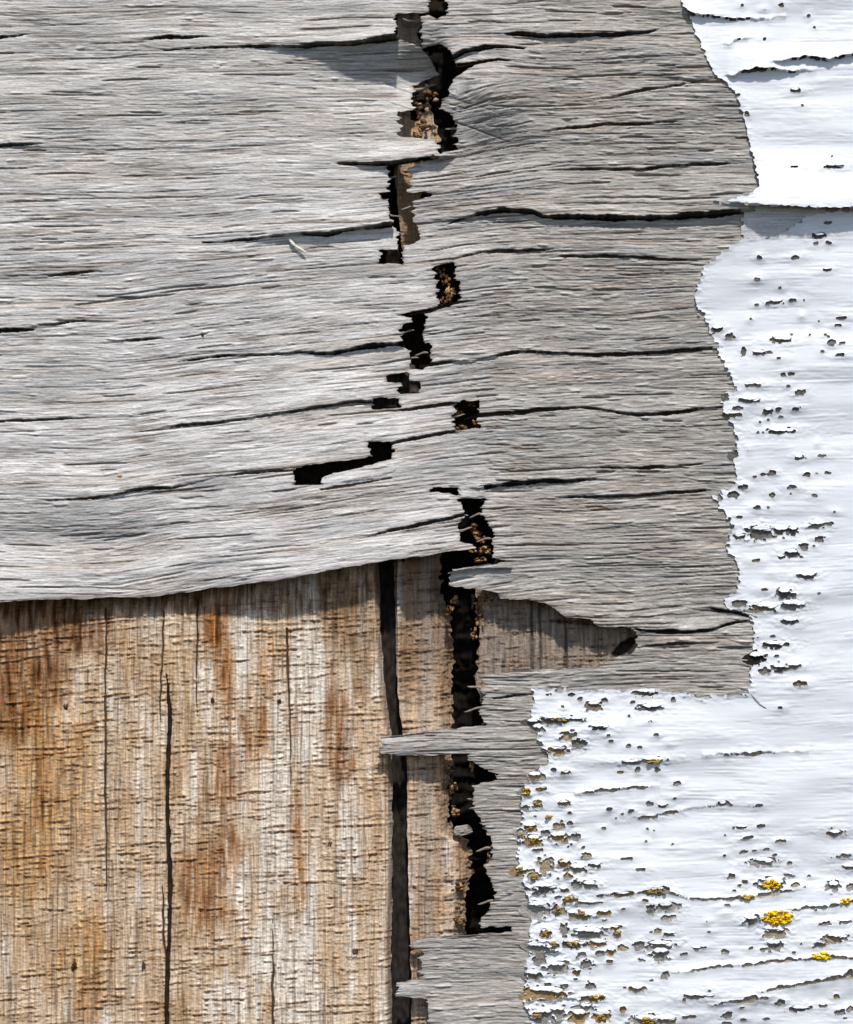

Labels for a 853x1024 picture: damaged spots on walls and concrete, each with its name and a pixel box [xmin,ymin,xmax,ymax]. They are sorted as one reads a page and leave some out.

crack [150,0,657,264]
peeling [741,204,833,245]
crack [171,249,722,490]
peeling [721,383,806,419]
crack [376,463,706,729]
peeling [732,588,806,625]
peeling [742,635,806,687]
peeling [733,516,834,559]
crack [159,601,199,1024]
crack [378,559,412,1024]
crack [447,754,511,932]
peeling [508,692,853,1024]